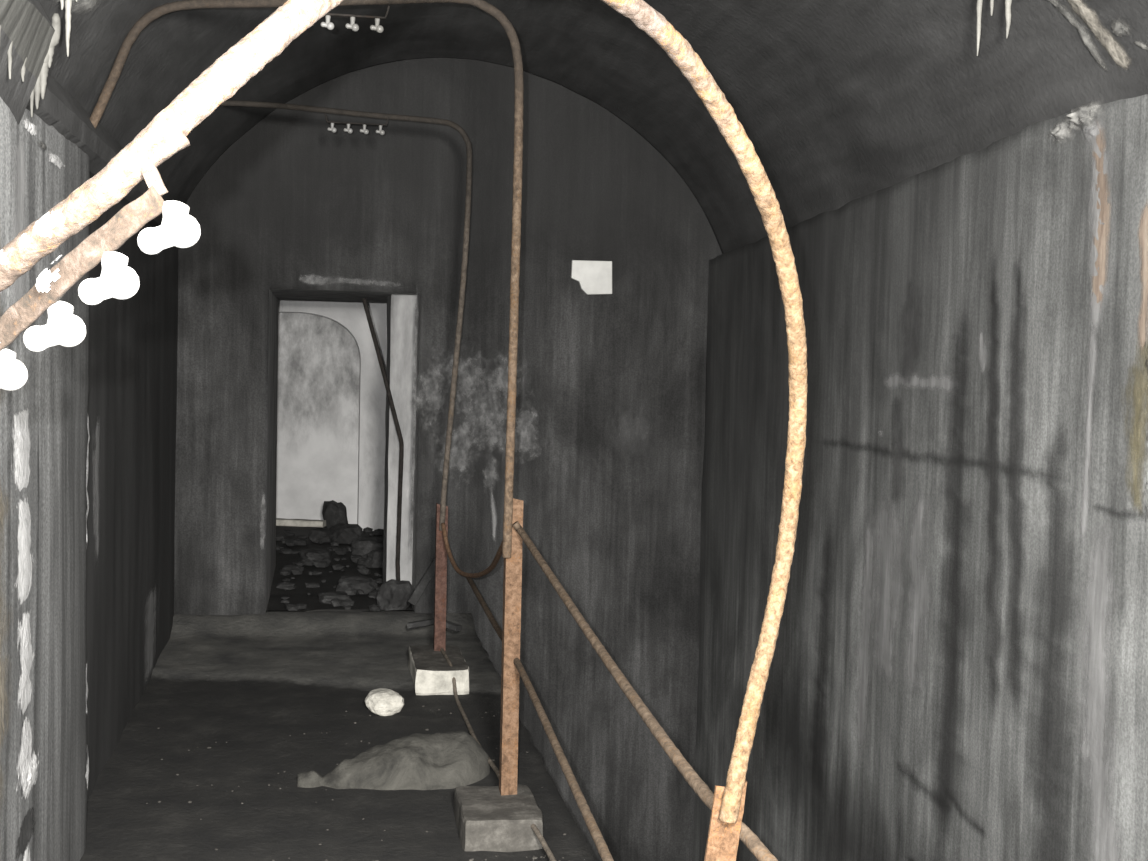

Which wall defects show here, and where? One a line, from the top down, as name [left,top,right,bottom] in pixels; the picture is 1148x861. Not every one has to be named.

water stain [1047,0,1148,70]
rust [1081,123,1110,537]
rust [1139,205,1148,347]
peeling [12,409,39,861]
water stain [856,404,929,746]
water stain [1083,535,1119,861]